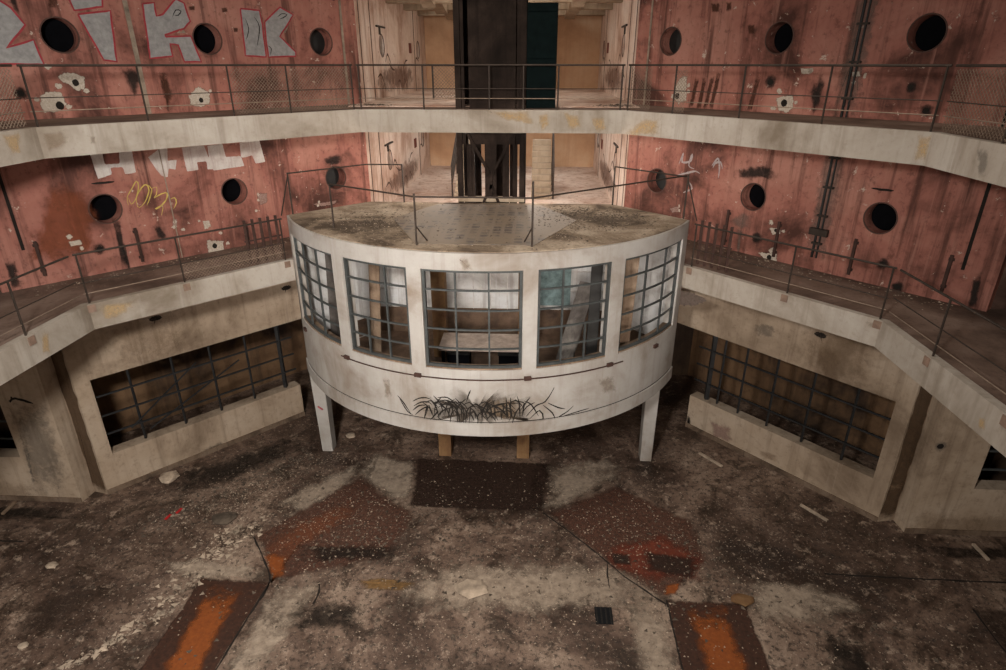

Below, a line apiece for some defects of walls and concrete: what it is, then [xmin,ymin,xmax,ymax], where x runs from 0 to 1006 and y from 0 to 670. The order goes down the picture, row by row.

corrosion [140,578,267,670]
corrosion [667,601,770,670]